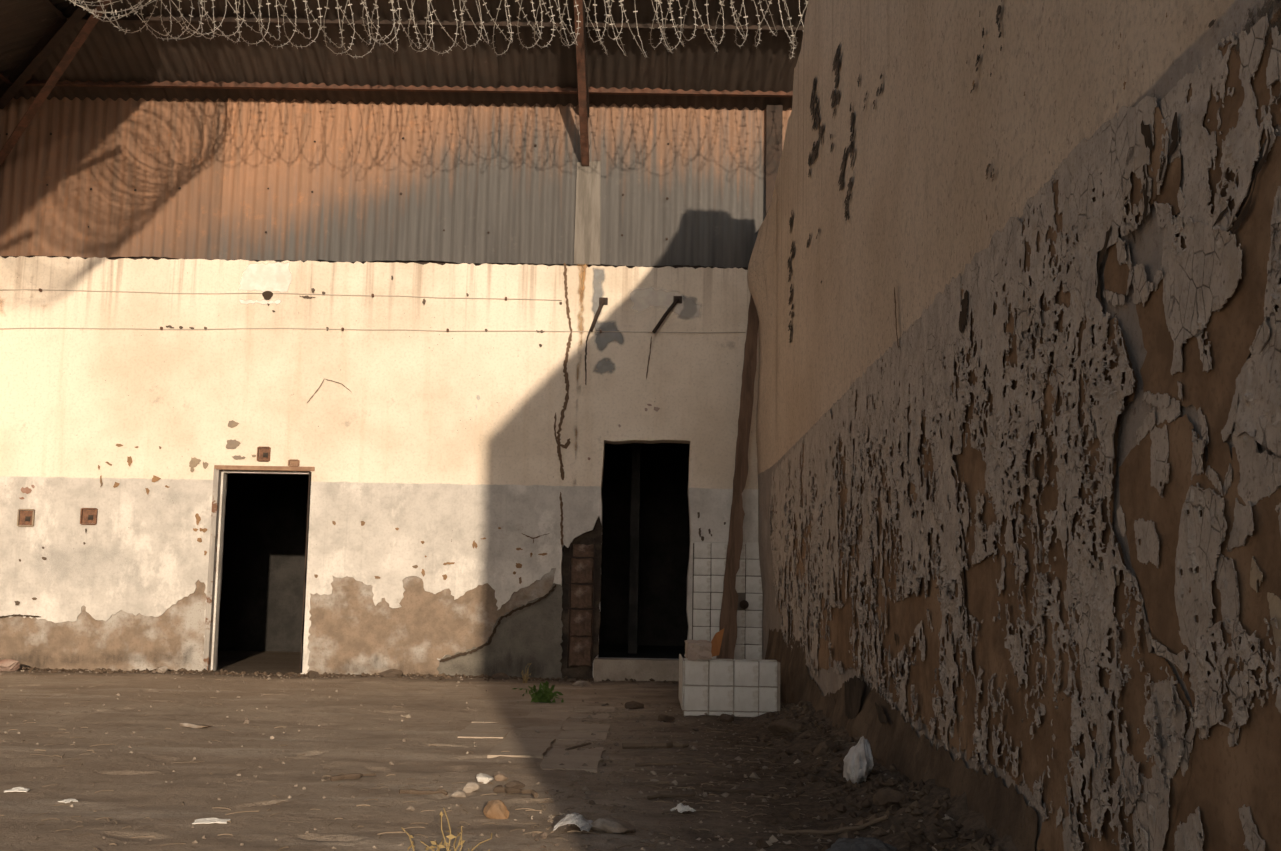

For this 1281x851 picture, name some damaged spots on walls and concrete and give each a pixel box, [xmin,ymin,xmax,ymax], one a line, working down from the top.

crack [521,262,590,545]
peeling [765,0,1281,851]
spalling [0,580,207,671]
spalling [307,517,603,679]
crack [440,585,556,662]